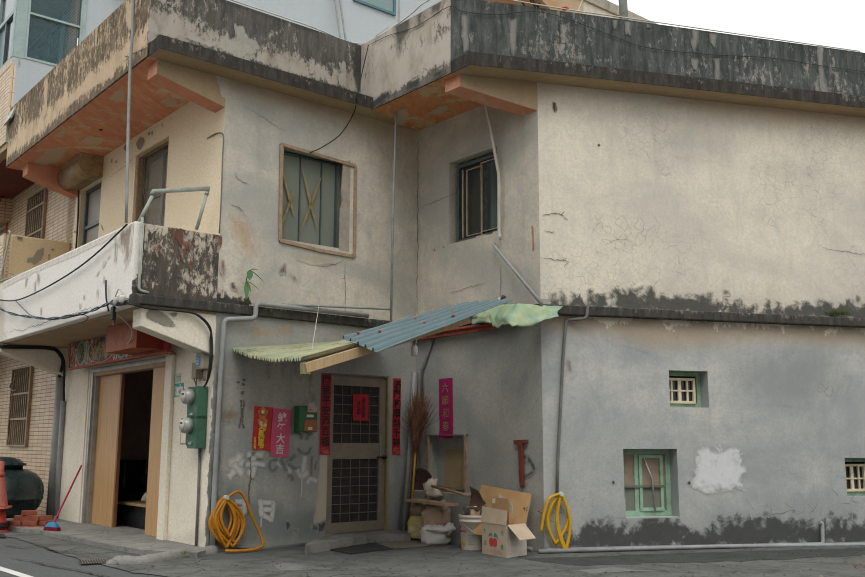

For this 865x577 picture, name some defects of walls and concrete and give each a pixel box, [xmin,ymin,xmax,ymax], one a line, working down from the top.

water stain [392,0,445,58]
water stain [460,13,470,53]
water stain [508,18,518,56]
water stain [691,30,721,80]
water stain [814,46,828,92]
peeling [26,243,55,265]
water stain [490,171,865,414]
water stain [544,488,865,549]